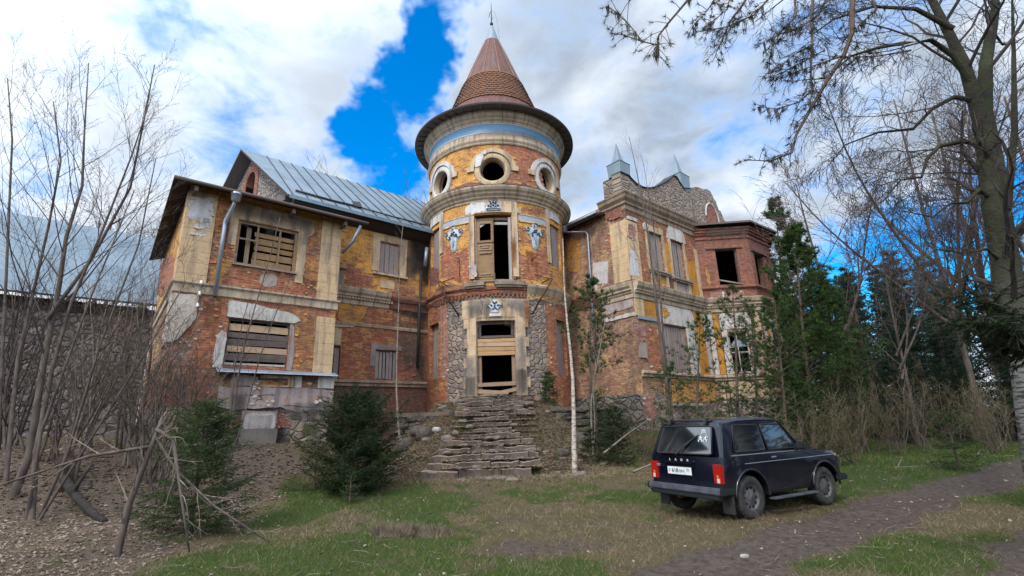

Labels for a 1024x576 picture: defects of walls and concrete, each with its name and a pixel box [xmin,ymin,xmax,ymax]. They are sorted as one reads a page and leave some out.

flaking render [163,296,230,366]
flaking render [188,197,323,404]
flaking render [246,380,291,443]